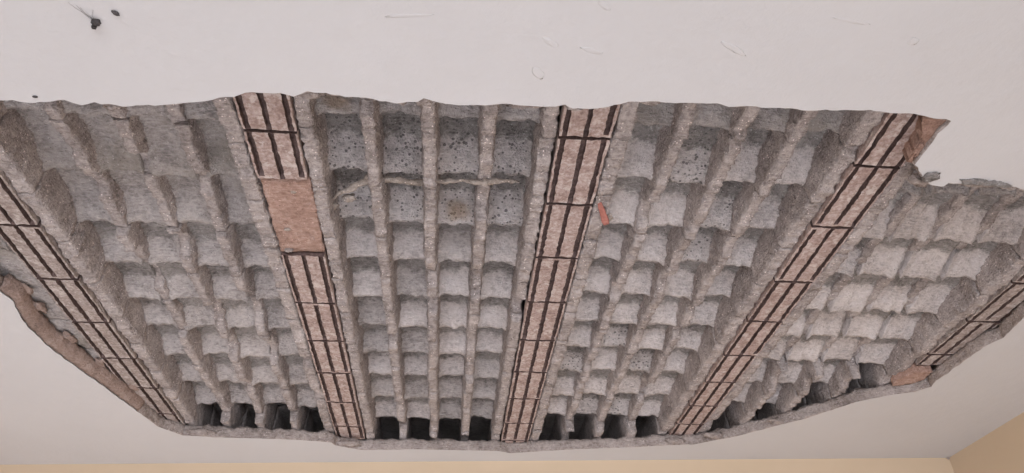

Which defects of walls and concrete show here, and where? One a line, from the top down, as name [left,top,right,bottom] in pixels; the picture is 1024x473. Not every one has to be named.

spalling [274,91,340,99]
spalling [398,98,433,107]
spalling [902,115,1018,190]
spalling [260,171,326,253]
spalling [0,274,1024,453]